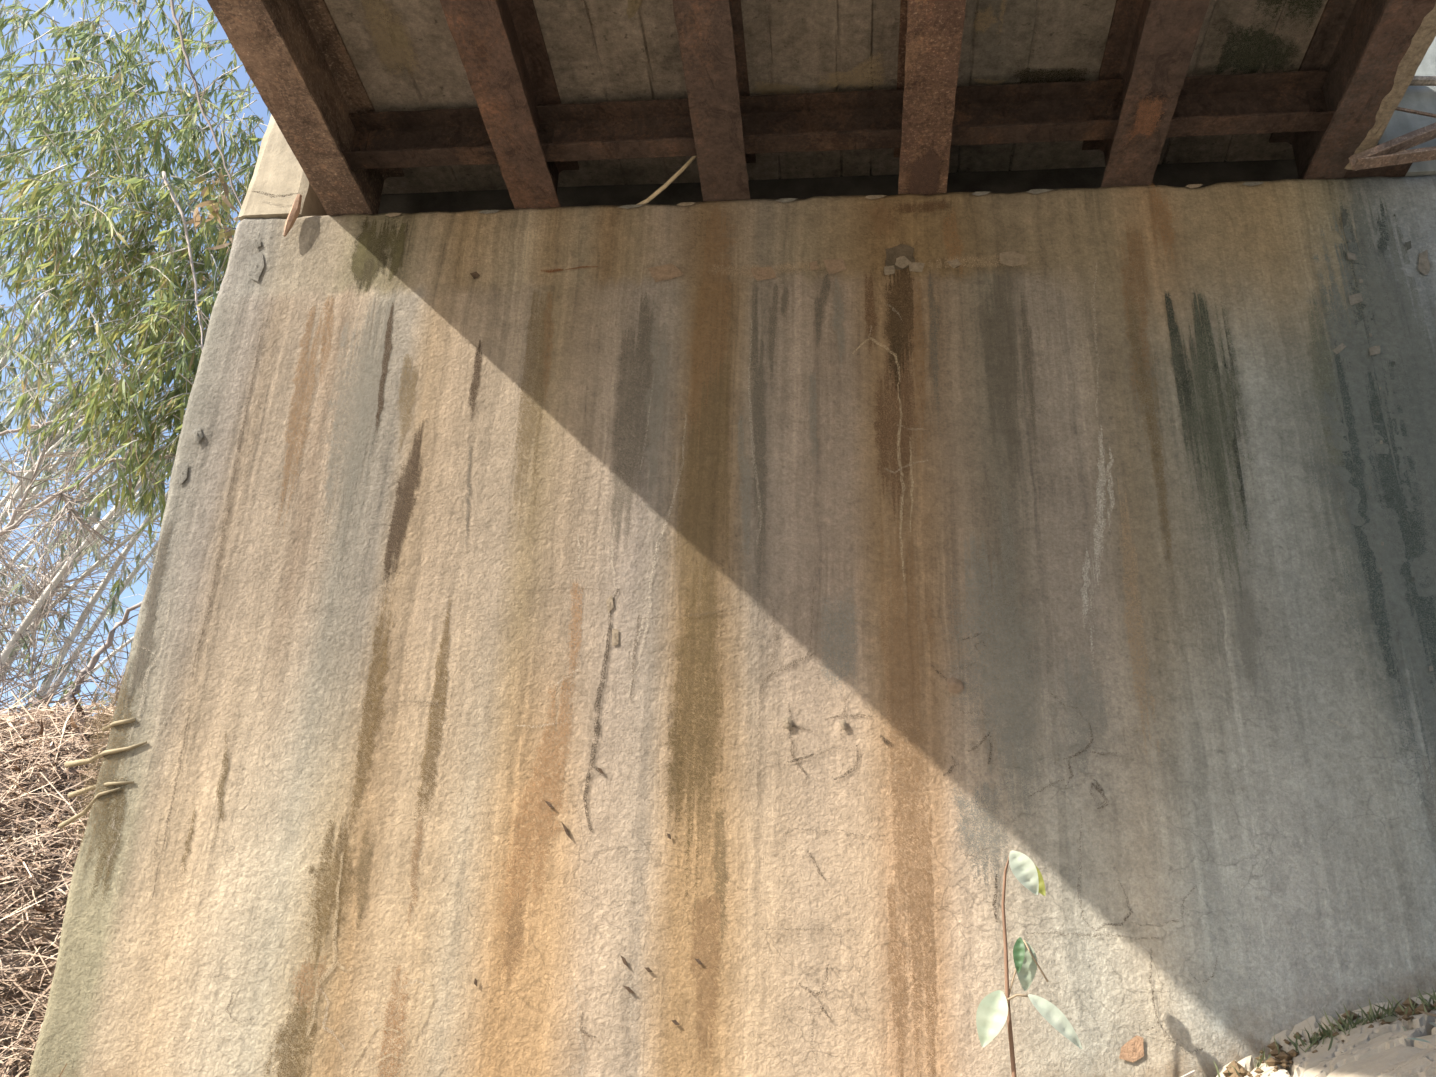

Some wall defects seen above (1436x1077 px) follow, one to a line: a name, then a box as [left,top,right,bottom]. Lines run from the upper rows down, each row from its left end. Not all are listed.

mould [1207,0,1327,75]
water stain [263,223,424,1077]
crack [639,587,891,800]
water stain [1142,290,1265,700]
water stain [1278,182,1436,850]